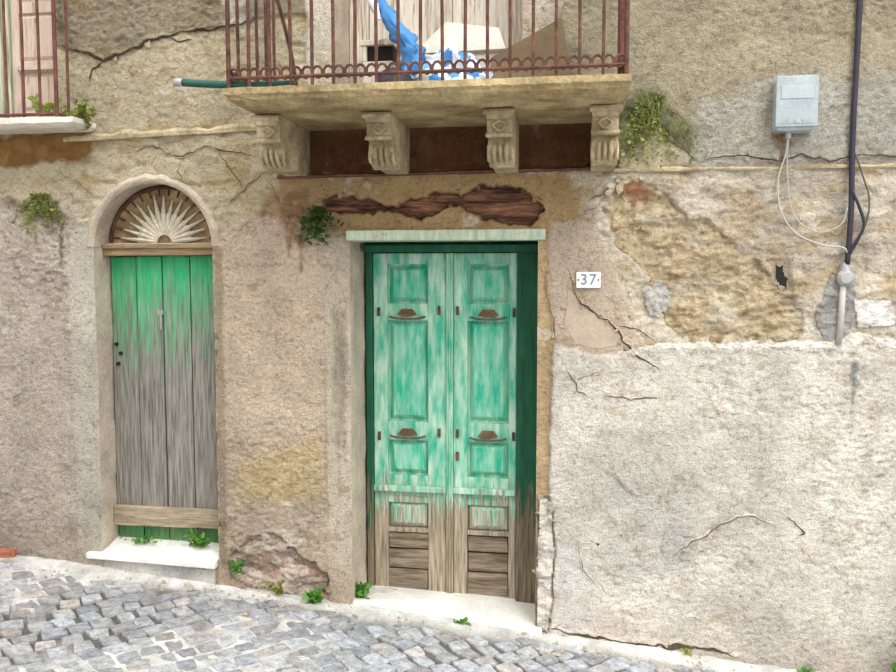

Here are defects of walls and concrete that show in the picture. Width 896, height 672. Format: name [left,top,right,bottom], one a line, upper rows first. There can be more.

crack [60,15,255,81]
flaking render [559,176,896,356]
crack [541,265,662,401]
flaking render [226,533,332,596]
crack [669,514,808,559]